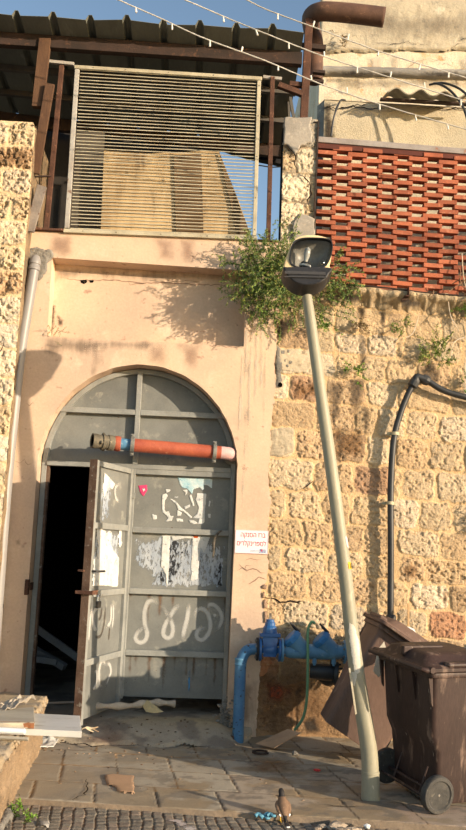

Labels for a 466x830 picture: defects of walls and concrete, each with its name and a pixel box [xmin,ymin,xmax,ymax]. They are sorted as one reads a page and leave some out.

peeling [282,117,312,154]
peeling [292,213,315,239]
crack [63,277,239,287]
crack [237,558,300,615]